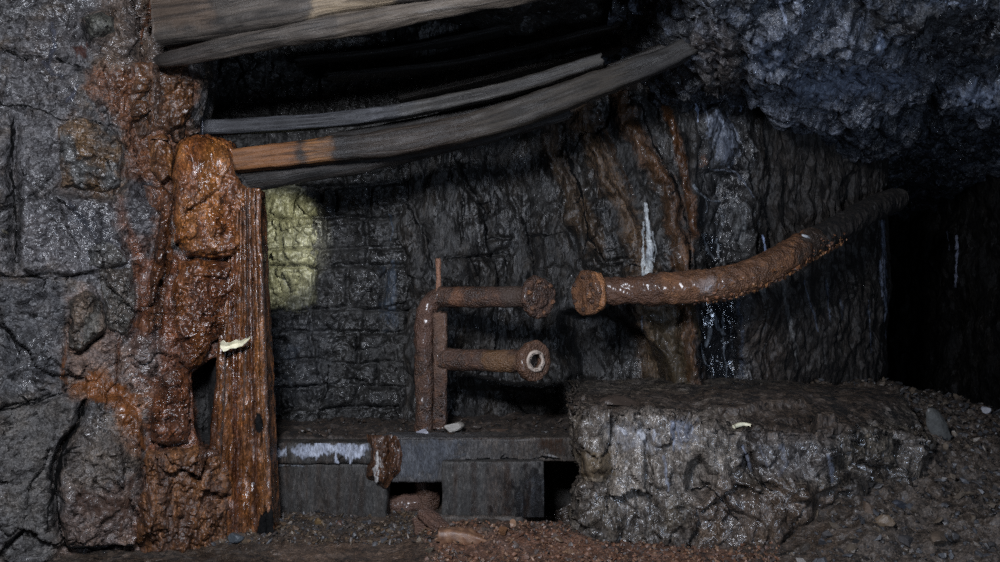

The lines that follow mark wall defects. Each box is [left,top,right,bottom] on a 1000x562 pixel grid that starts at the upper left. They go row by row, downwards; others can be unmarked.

damp [641,202,656,276]
corrosion [61,338,150,451]
damp [265,436,368,467]
corrosion [366,434,402,489]